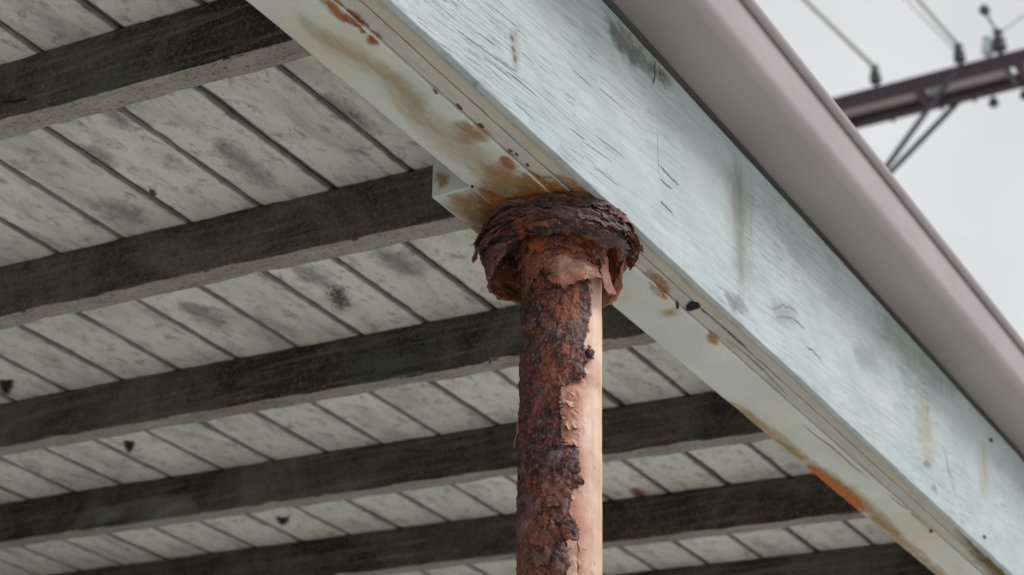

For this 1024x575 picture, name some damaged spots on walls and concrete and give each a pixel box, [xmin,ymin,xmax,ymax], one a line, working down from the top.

corrosion [324,0,381,44]
corrosion [471,152,644,309]
mould [328,285,351,311]
corrosion [650,274,673,315]
crack [772,303,822,361]
corrosion [742,409,941,575]